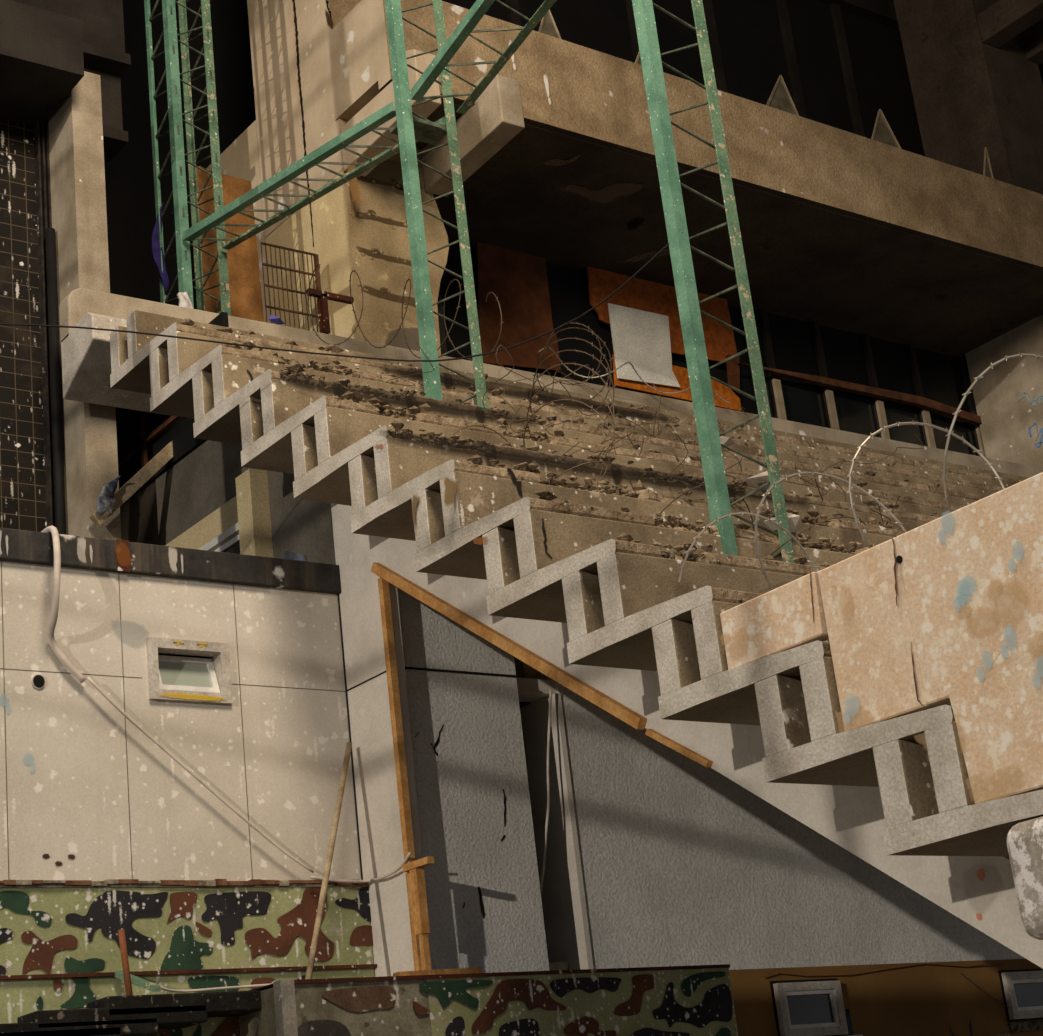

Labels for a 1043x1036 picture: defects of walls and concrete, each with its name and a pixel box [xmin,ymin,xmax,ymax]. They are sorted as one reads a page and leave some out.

crack [891,538,899,605]
crack [911,642,922,705]
crack [415,724,444,756]
crack [499,789,507,841]